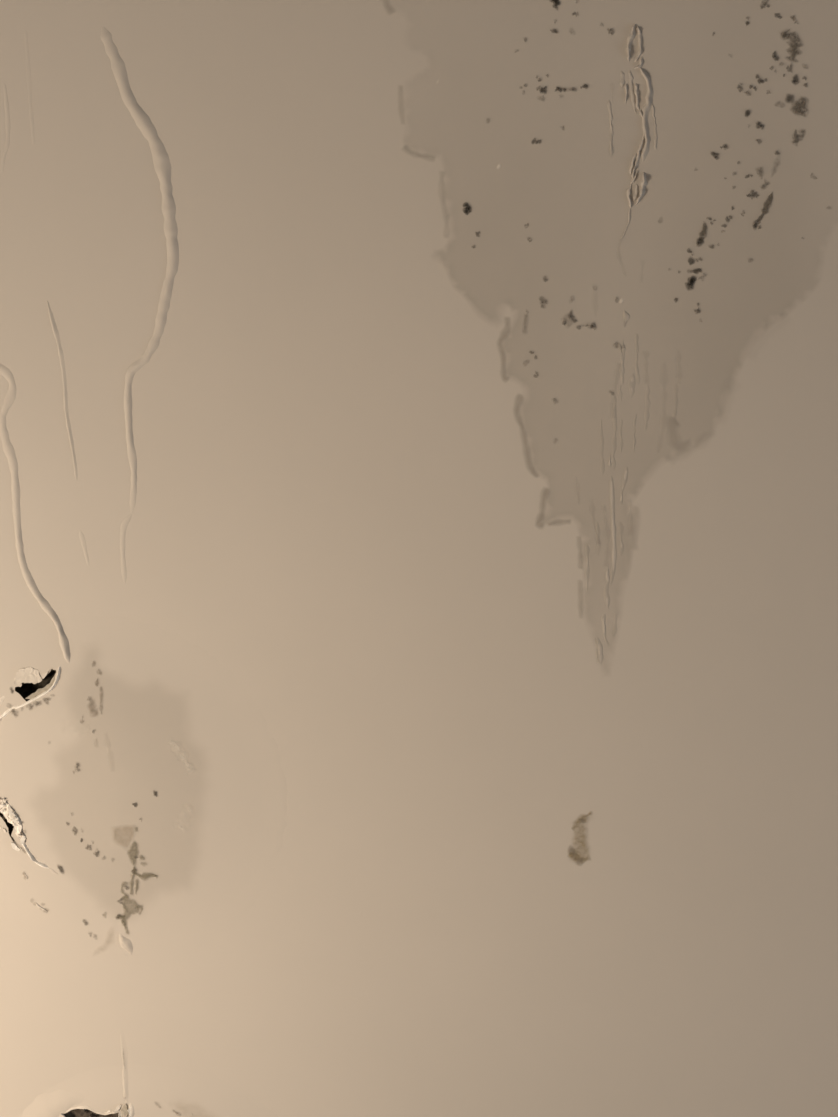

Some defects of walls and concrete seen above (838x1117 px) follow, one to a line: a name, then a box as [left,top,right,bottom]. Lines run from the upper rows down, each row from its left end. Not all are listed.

mould [761,2,807,114]
leakage [746,170,772,229]
leakage [687,207,734,289]
spalling [0,666,61,721]
peeling [0,799,59,876]
leakage [117,828,157,955]
spalling [61,1104,132,1117]